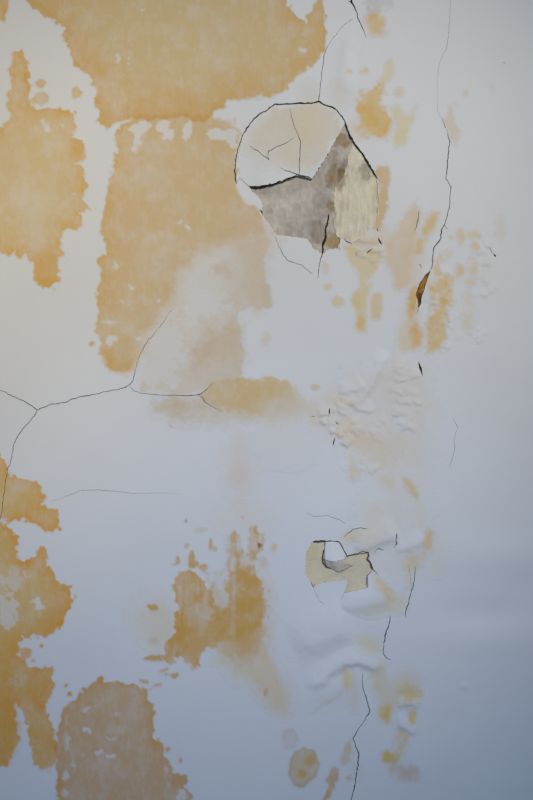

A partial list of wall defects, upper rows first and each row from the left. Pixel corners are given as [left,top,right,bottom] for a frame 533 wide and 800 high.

water stain [0,48,92,292]
water stain [25,0,446,539]
crack [234,0,377,189]
flaking render [251,125,378,253]
crack [416,3,451,313]
crack [0,311,222,518]
water stain [0,451,194,800]
water stain [209,570,364,800]
peeling [305,540,377,593]
crack [351,673,370,800]
crack [383,567,416,659]